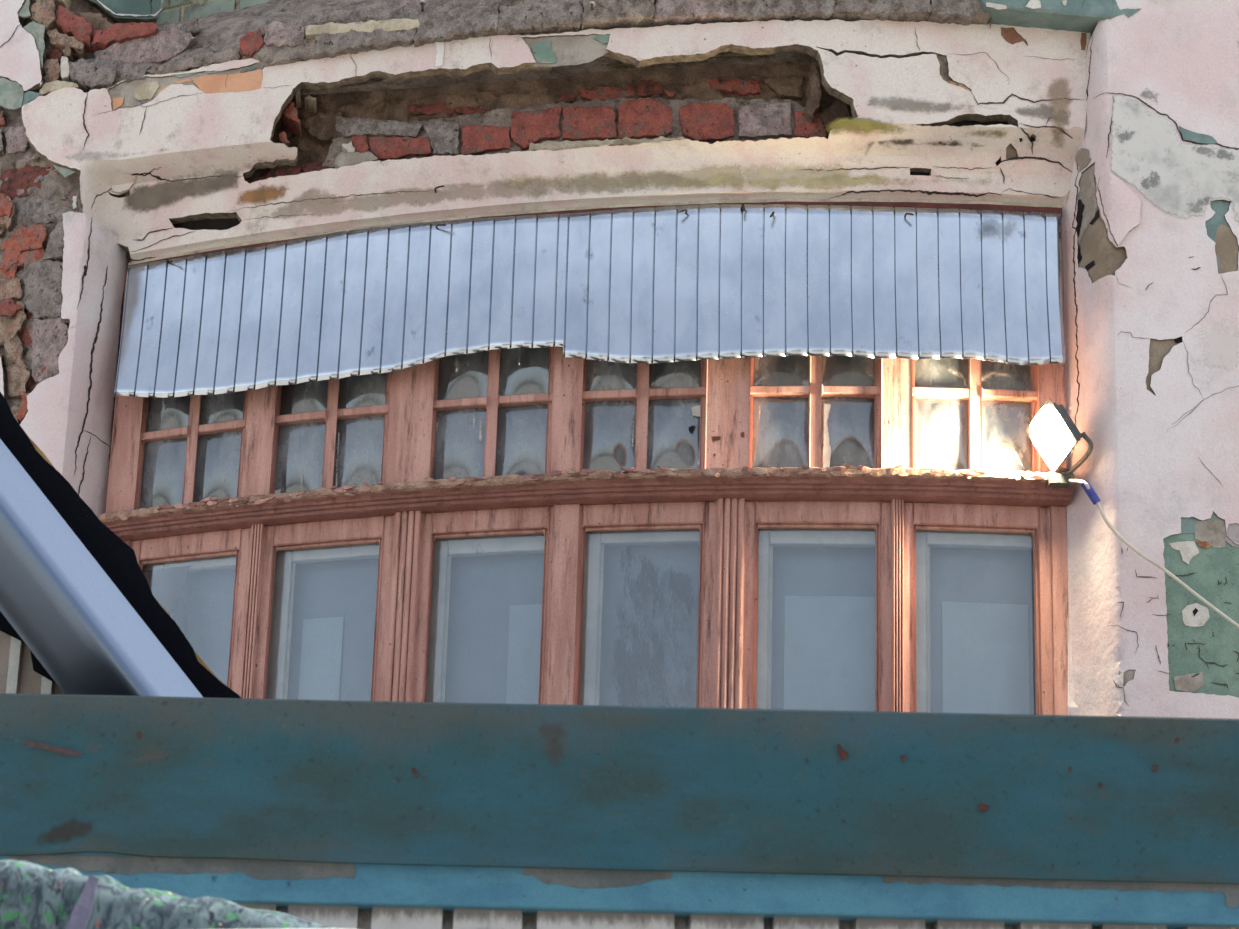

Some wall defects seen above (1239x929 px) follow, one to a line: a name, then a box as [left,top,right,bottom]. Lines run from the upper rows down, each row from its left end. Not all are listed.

peeling [1025,0,1041,9]
peeling [1111,0,1141,18]
crack [230,190,430,220]
spalling [0,0,1007,424]
crack [804,36,1239,458]
spalling [1075,148,1126,283]
peeling [1205,200,1239,274]
crack [74,167,241,495]
peeling [150,491,305,514]
peeling [928,467,991,479]
peeling [1007,471,1051,481]
peeling [1163,513,1239,697]